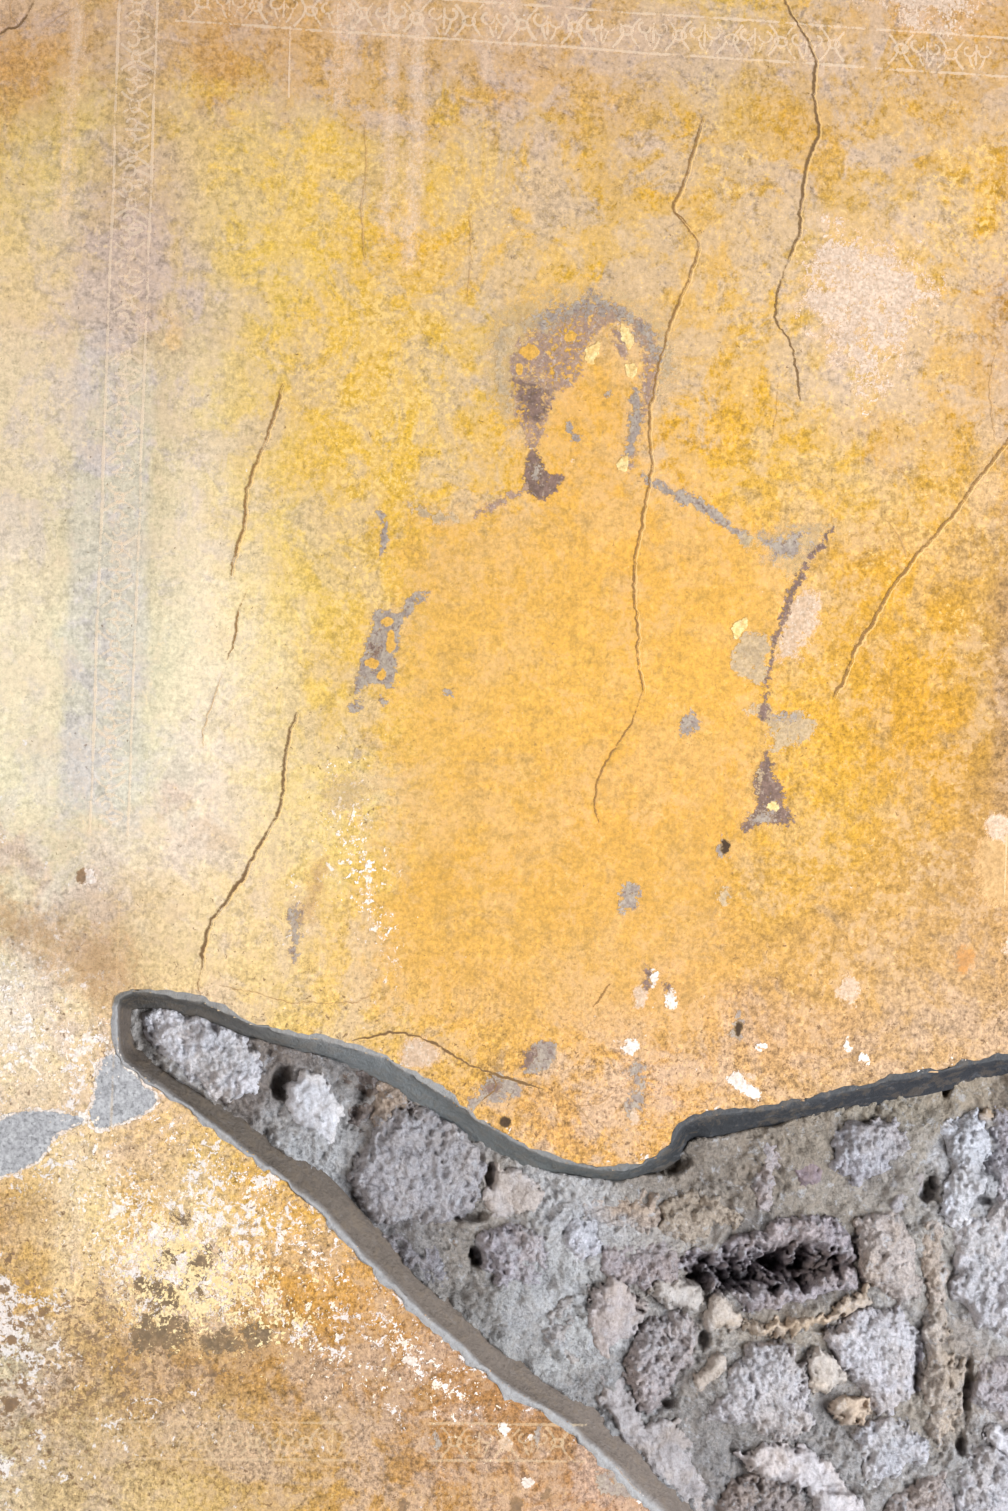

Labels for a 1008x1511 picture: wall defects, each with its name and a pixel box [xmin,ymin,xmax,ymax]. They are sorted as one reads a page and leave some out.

crack [769,0,821,451]
crack [202,384,283,748]
crack [594,117,703,829]
crack [833,354,1008,700]
spalling [0,989,1008,1511]